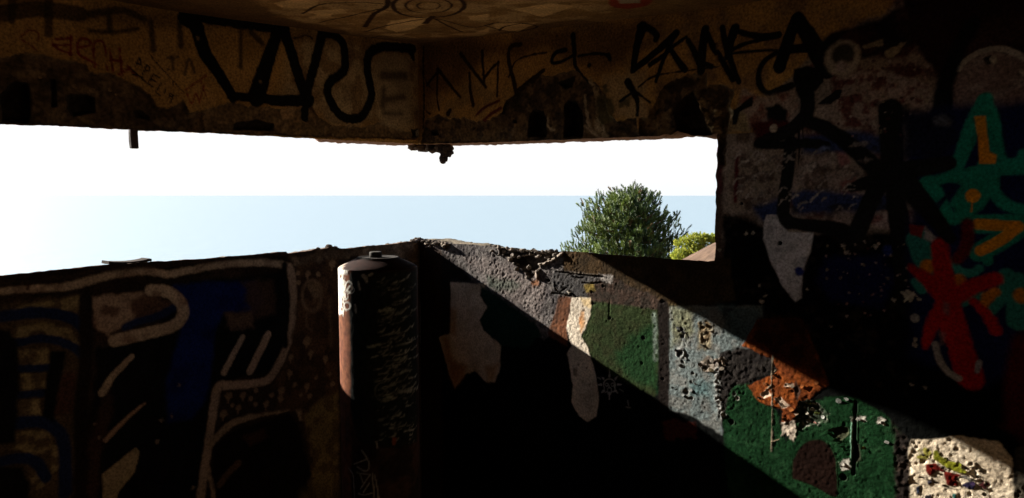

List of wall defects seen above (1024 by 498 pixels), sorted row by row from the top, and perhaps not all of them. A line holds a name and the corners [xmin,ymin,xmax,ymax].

spalling [386,237,452,251]
spalling [490,244,564,287]
peeling [671,315,886,471]